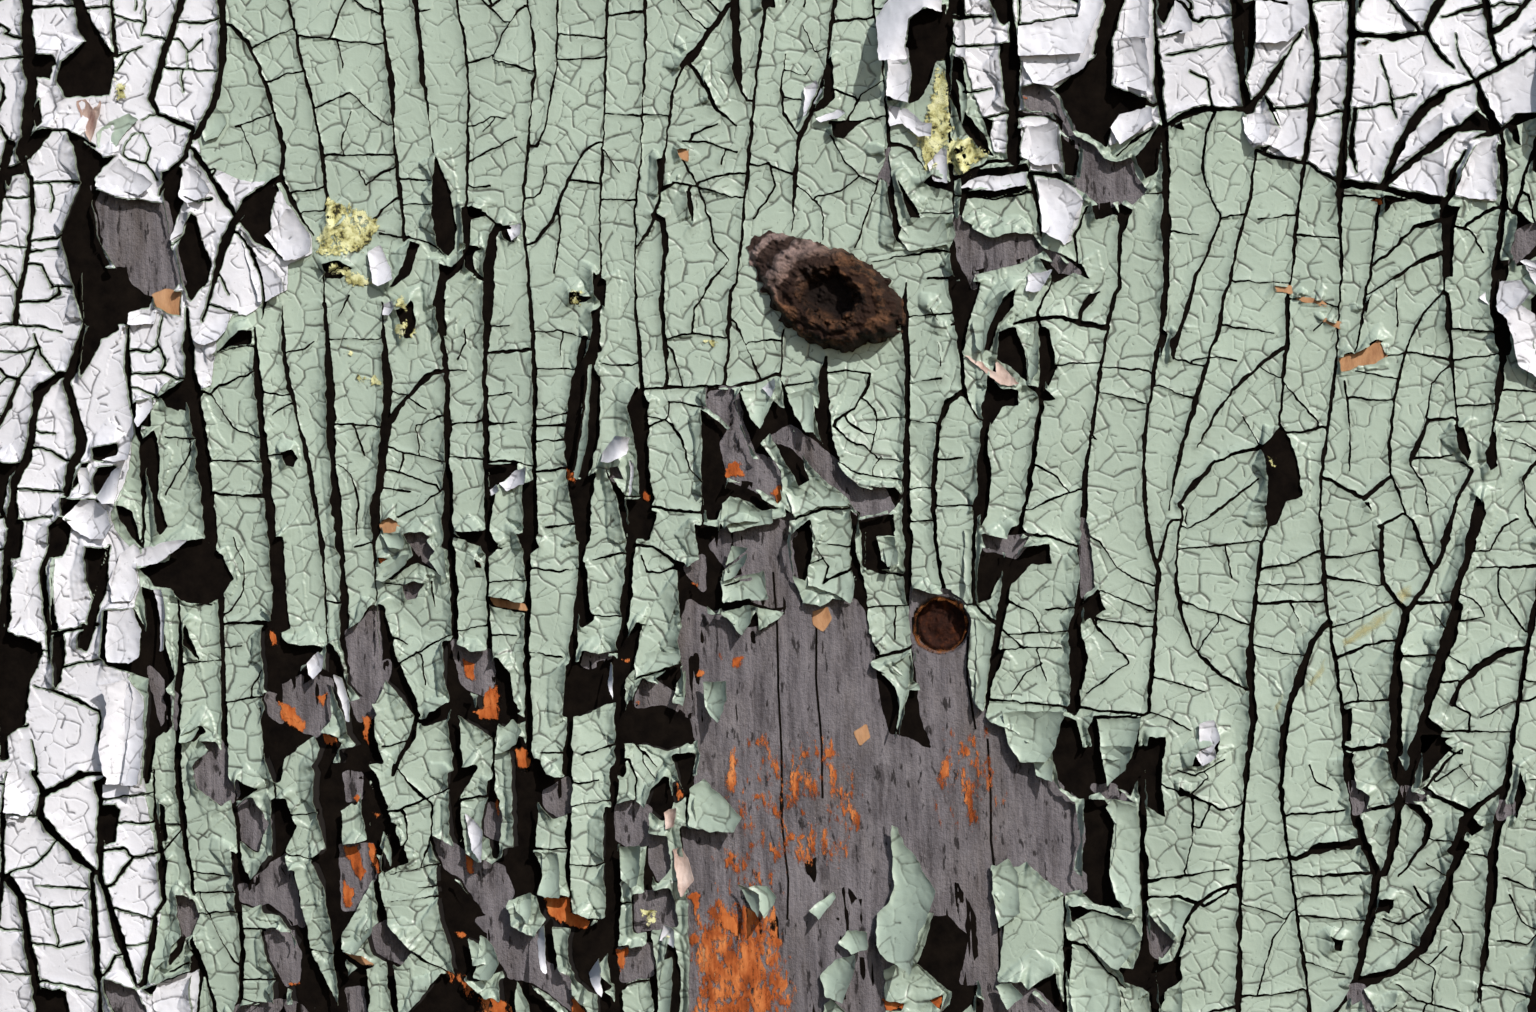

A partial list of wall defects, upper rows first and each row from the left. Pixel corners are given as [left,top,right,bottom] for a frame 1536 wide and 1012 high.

peeling [1240,0,1309,82]
peeling [1396,0,1433,22]
peeling [1242,93,1319,157]
peeling [1382,29,1536,377]
crack [0,0,888,1012]
peeling [0,0,1193,1012]
crack [787,0,1536,1012]
peeling [1258,424,1303,528]
rust [914,597,967,653]
rust [935,726,1007,826]
rust [687,734,863,1012]
rust [449,971,512,1012]